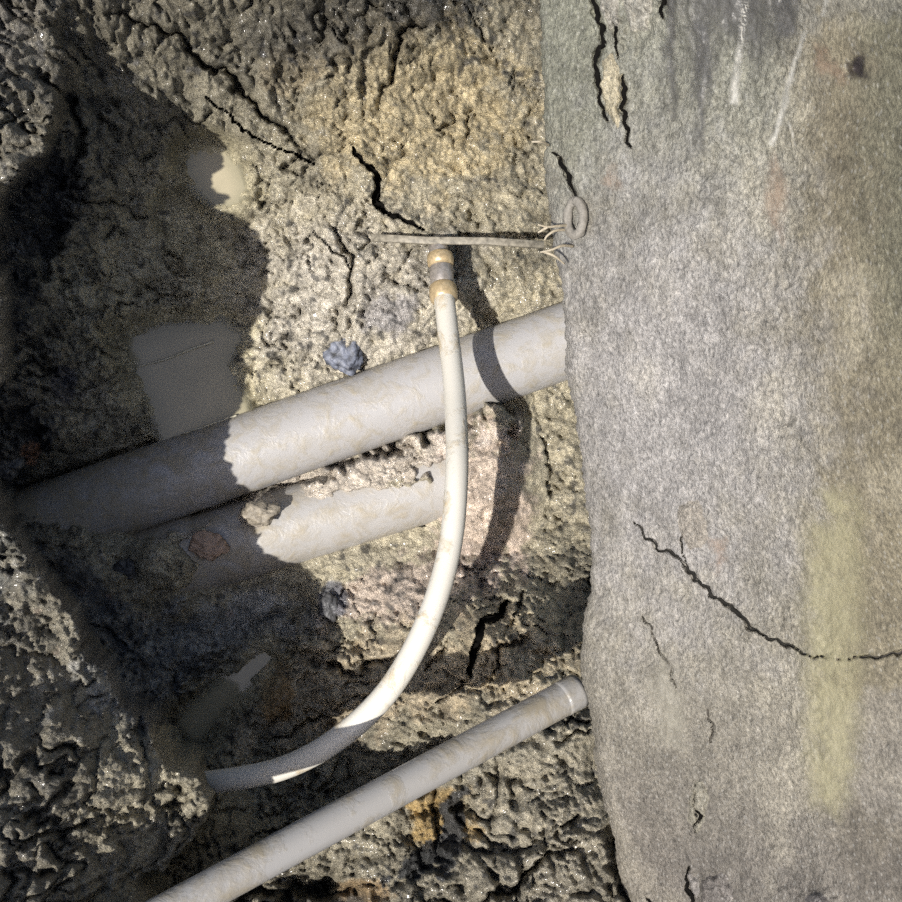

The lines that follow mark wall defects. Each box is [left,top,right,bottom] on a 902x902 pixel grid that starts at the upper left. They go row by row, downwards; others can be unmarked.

spalling [591,0,669,148]
crack [642,616,677,688]
crack [634,523,902,661]